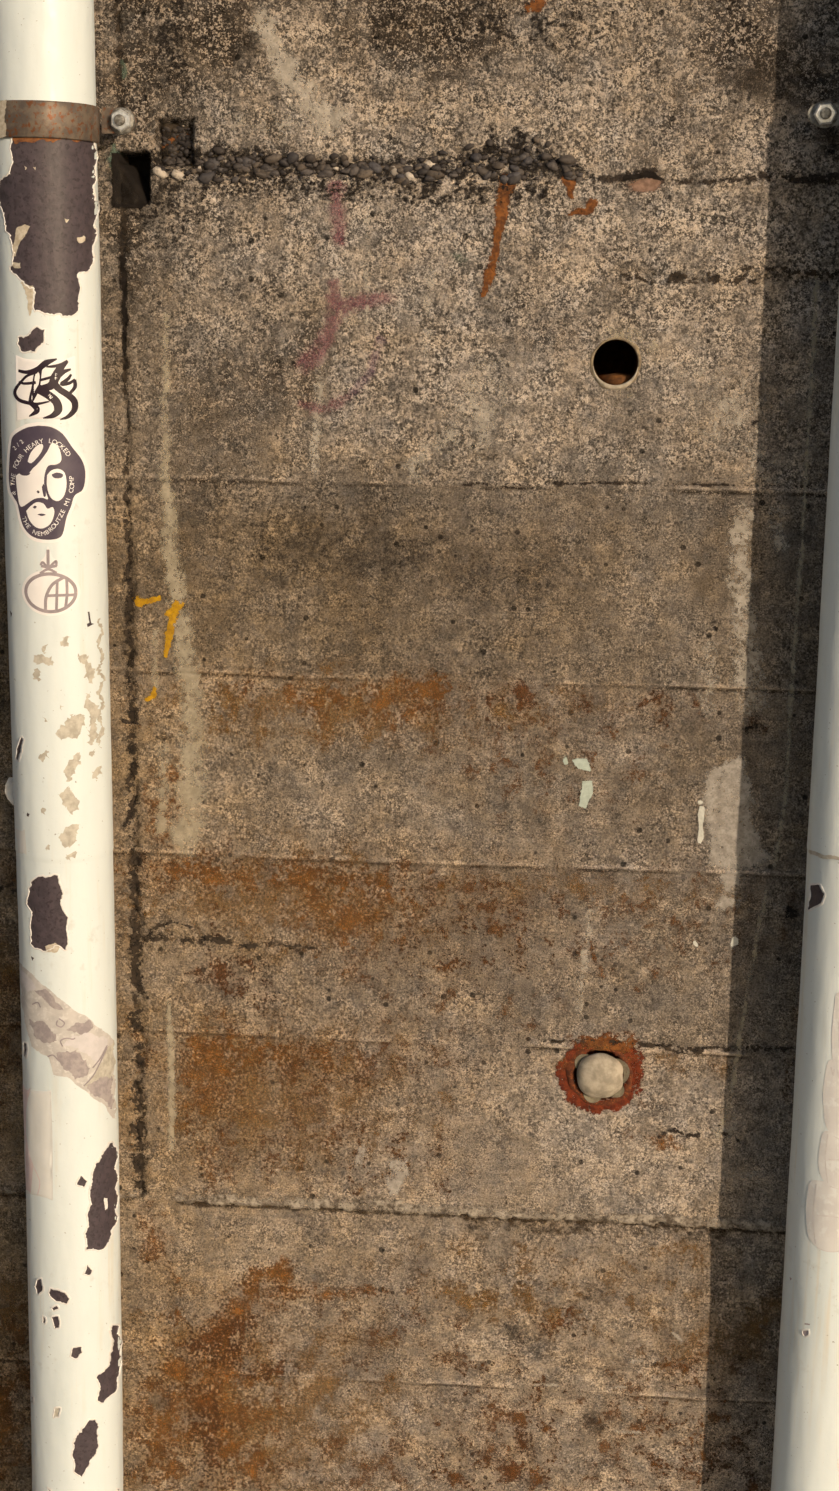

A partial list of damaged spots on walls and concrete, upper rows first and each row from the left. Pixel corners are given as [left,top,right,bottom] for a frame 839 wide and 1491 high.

corrosion [480,173,516,297]
water stain [697,275,819,909]
corrosion [113,758,800,1198]
water stain [716,890,767,1141]
corrosion [122,1201,782,1491]